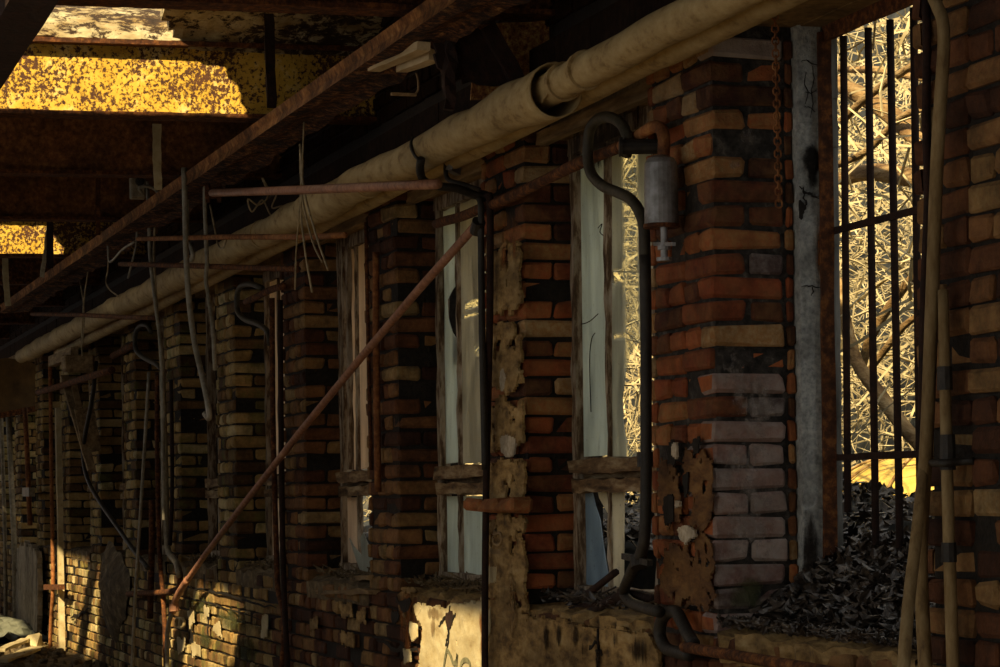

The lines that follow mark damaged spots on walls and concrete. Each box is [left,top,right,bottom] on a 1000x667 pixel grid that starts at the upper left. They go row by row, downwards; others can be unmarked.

crack [801,59,817,118]
crack [799,186,819,206]
flaking render [485,239,528,499]
peeling [657,436,717,612]
peeling [338,601,367,648]